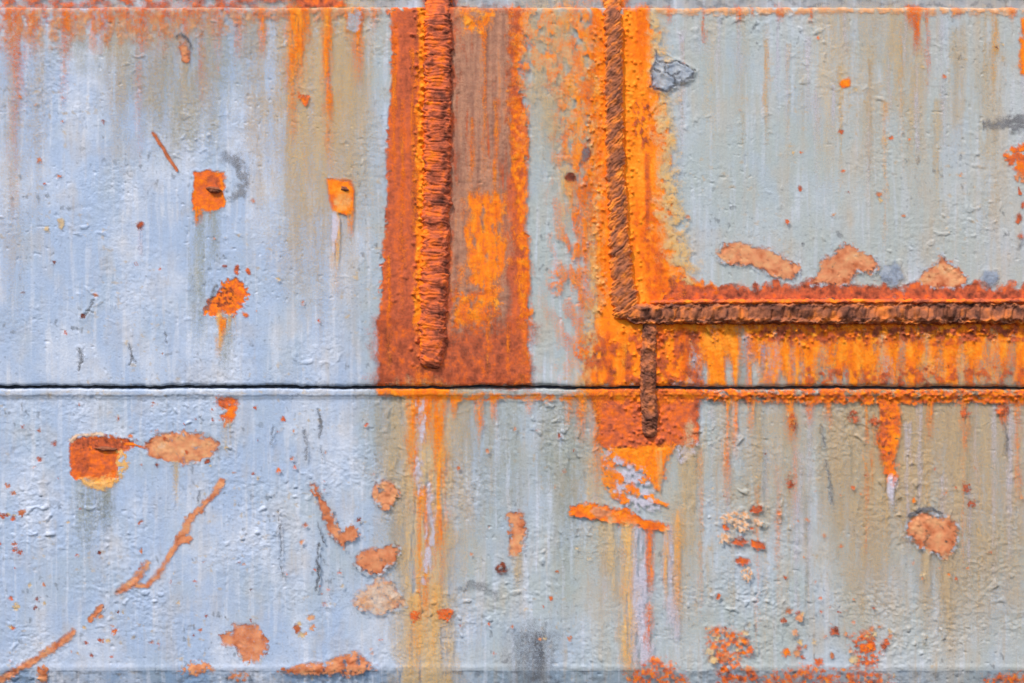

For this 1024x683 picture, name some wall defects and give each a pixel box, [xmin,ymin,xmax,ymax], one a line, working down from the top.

rust [617,0,1024,305]
rust [191,169,227,226]
rust [203,264,257,356]
rust [326,176,355,298]
peeling [715,239,905,289]
peeling [918,251,967,290]
peeling [307,478,409,616]
peeling [904,506,962,632]
rust [35,665,49,683]
rust [177,659,215,677]
rust [277,648,378,679]
rust [704,597,892,683]